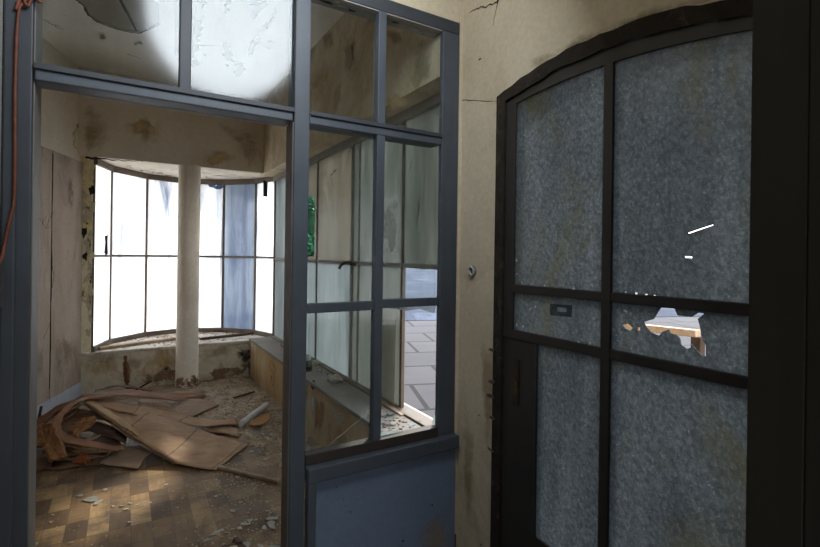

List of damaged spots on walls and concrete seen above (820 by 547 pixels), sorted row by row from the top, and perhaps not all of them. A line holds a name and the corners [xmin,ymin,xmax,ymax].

peeling [76,0,161,45]
peeling [191,0,211,67]
flaking render [143,364,249,388]